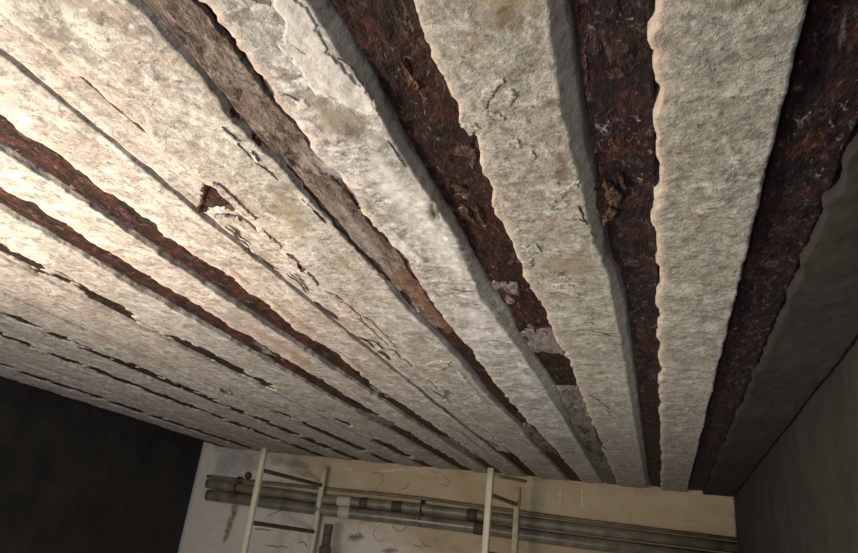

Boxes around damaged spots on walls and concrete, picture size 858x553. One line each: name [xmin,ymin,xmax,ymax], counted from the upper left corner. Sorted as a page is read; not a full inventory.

peeling [251,0,380,116]
spalling [229,107,243,123]
peeling [461,78,517,136]
spalling [250,131,266,163]
spalling [429,200,440,222]
spalling [594,171,626,225]
spalling [195,182,397,349]